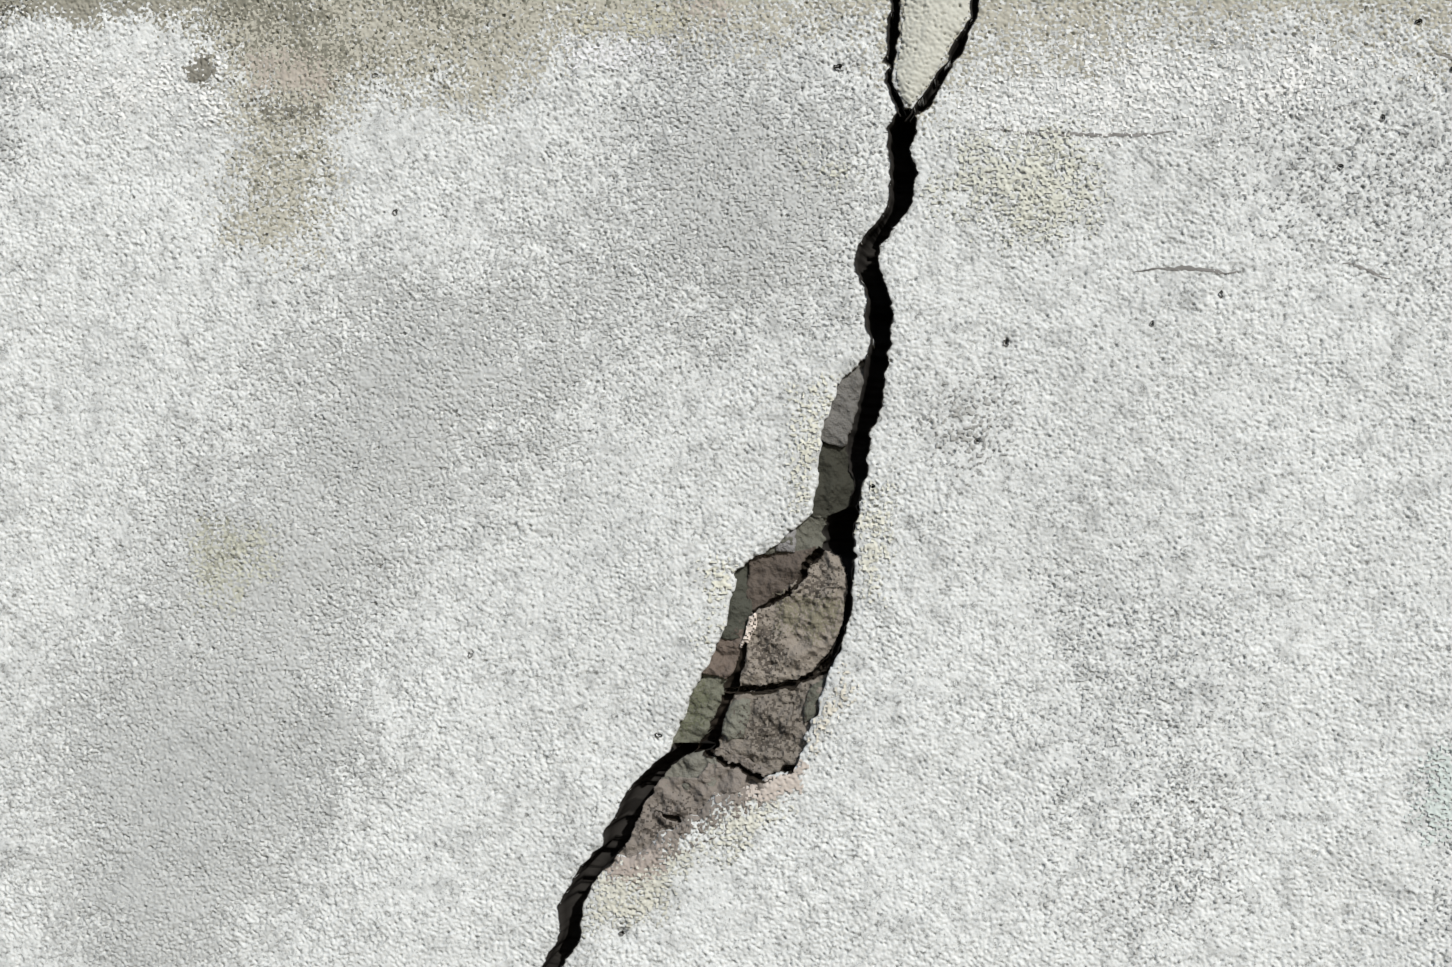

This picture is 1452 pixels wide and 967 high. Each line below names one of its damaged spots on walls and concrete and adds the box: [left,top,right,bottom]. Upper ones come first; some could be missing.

spalling [582,360,875,941]
crack [542,0,979,967]